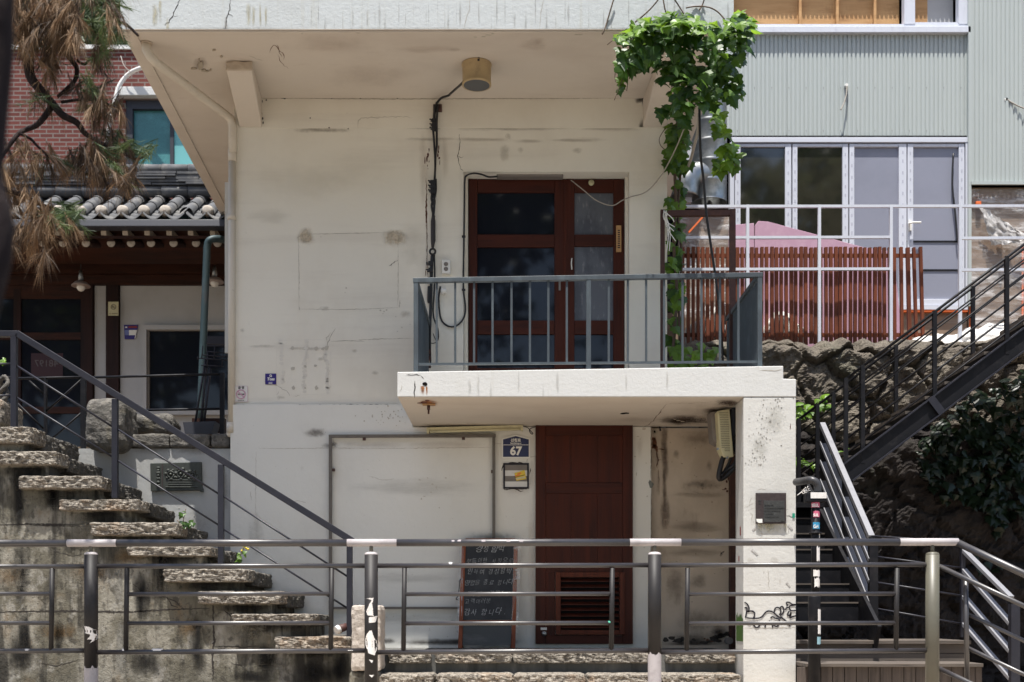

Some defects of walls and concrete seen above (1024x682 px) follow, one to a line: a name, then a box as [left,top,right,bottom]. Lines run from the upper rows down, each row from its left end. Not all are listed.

water stain [9,468,43,527]
water stain [10,551,27,597]
water stain [10,617,31,666]